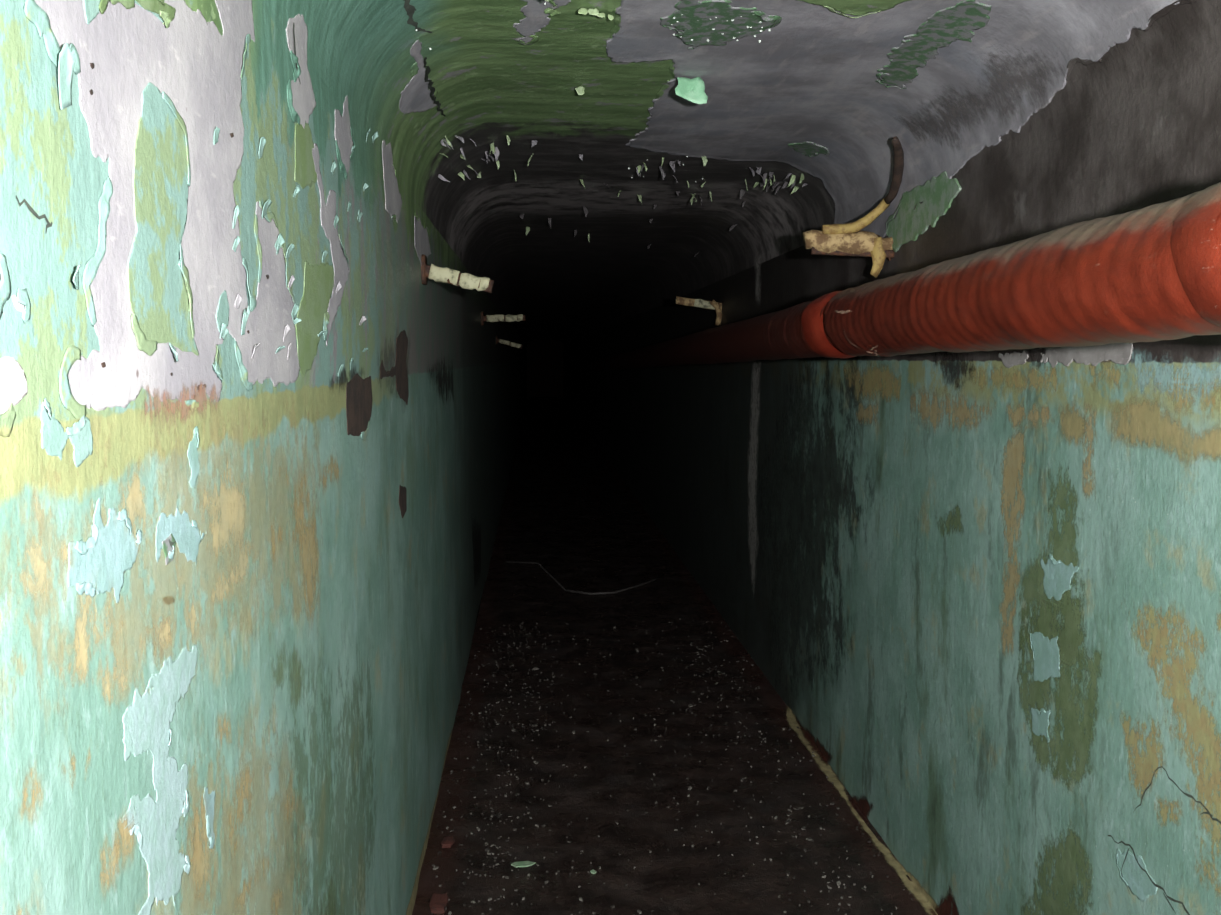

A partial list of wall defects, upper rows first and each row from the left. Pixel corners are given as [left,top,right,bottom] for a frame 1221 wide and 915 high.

crack [404,0,432,33]
peeling [399,40,446,116]
peeling [438,135,510,182]
peeling [513,0,1197,252]
peeling [23,0,431,488]
peeling [0,252,31,323]
peeling [0,356,28,437]
peeling [68,498,206,603]
peeling [120,644,217,915]
crack [1134,766,1221,824]
crack [1108,835,1190,915]